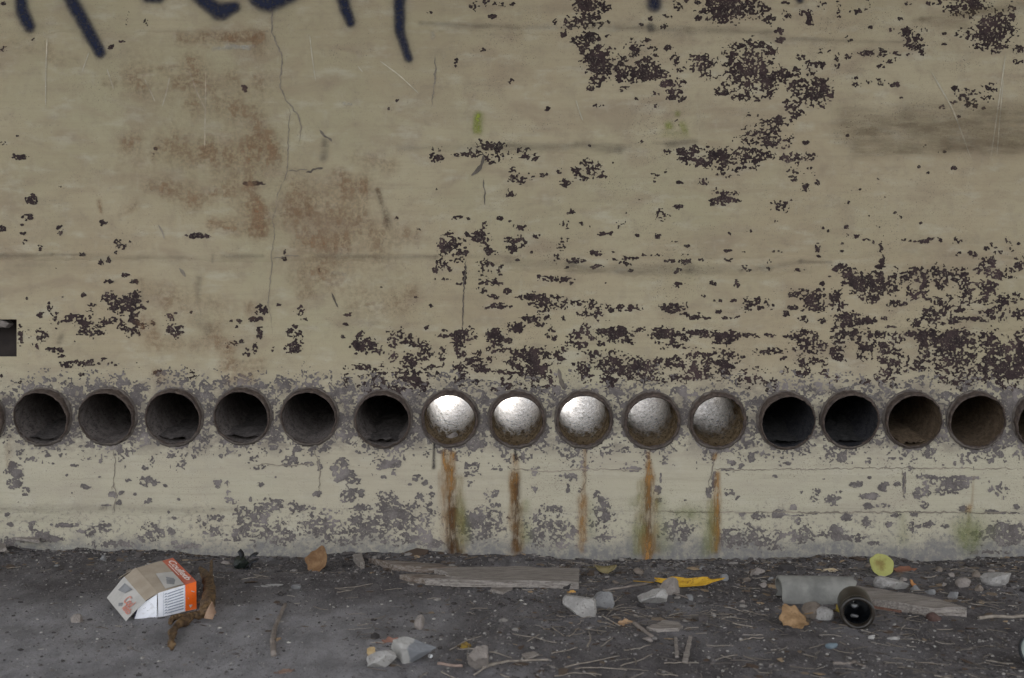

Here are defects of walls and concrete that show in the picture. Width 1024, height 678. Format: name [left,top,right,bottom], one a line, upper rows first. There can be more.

peeling [469,0,516,19]
peeling [926,0,1024,65]
peeling [552,0,928,222]
peeling [939,82,998,118]
crack [268,12,332,333]
peeling [429,138,614,197]
peeling [19,193,43,251]
peeling [0,204,1024,554]
rust [442,452,459,553]
rust [511,472,520,551]
rust [639,462,654,560]
rust [710,473,720,550]